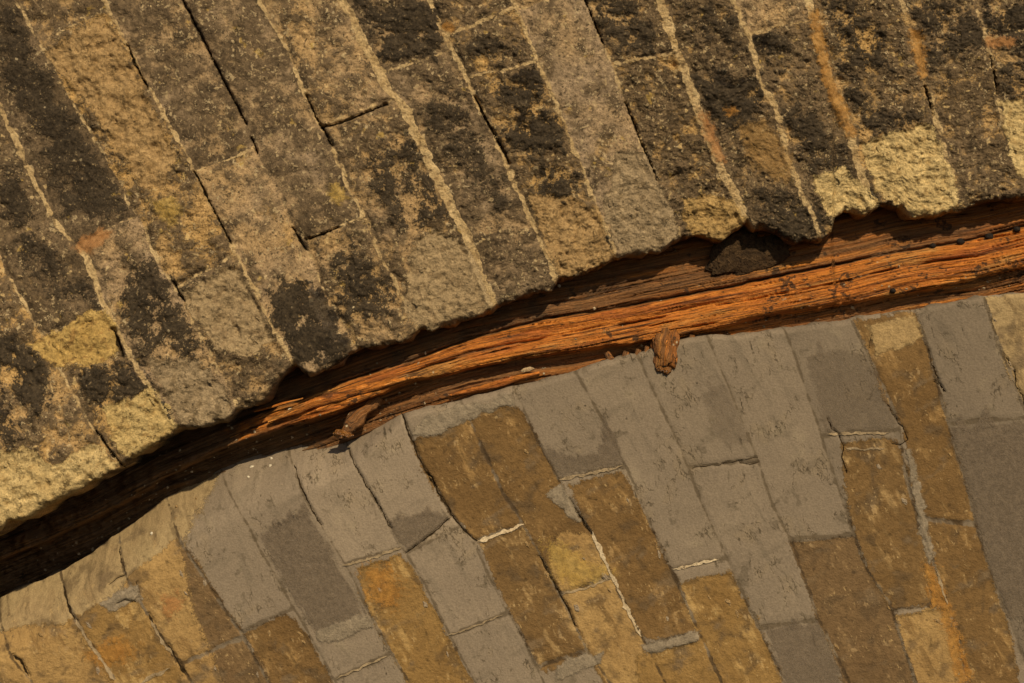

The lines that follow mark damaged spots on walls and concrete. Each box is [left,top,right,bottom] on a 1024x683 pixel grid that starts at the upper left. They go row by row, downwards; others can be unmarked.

water stain [0,0,133,224]
crack [293,228,337,250]
crack [307,96,388,146]
water stain [352,0,448,67]
water stain [363,124,451,236]
water stain [495,71,593,204]
water stain [822,0,932,141]
water stain [909,0,1024,82]
water stain [0,330,65,452]
water stain [80,253,214,409]
water stain [258,234,399,376]
crack [827,418,847,473]